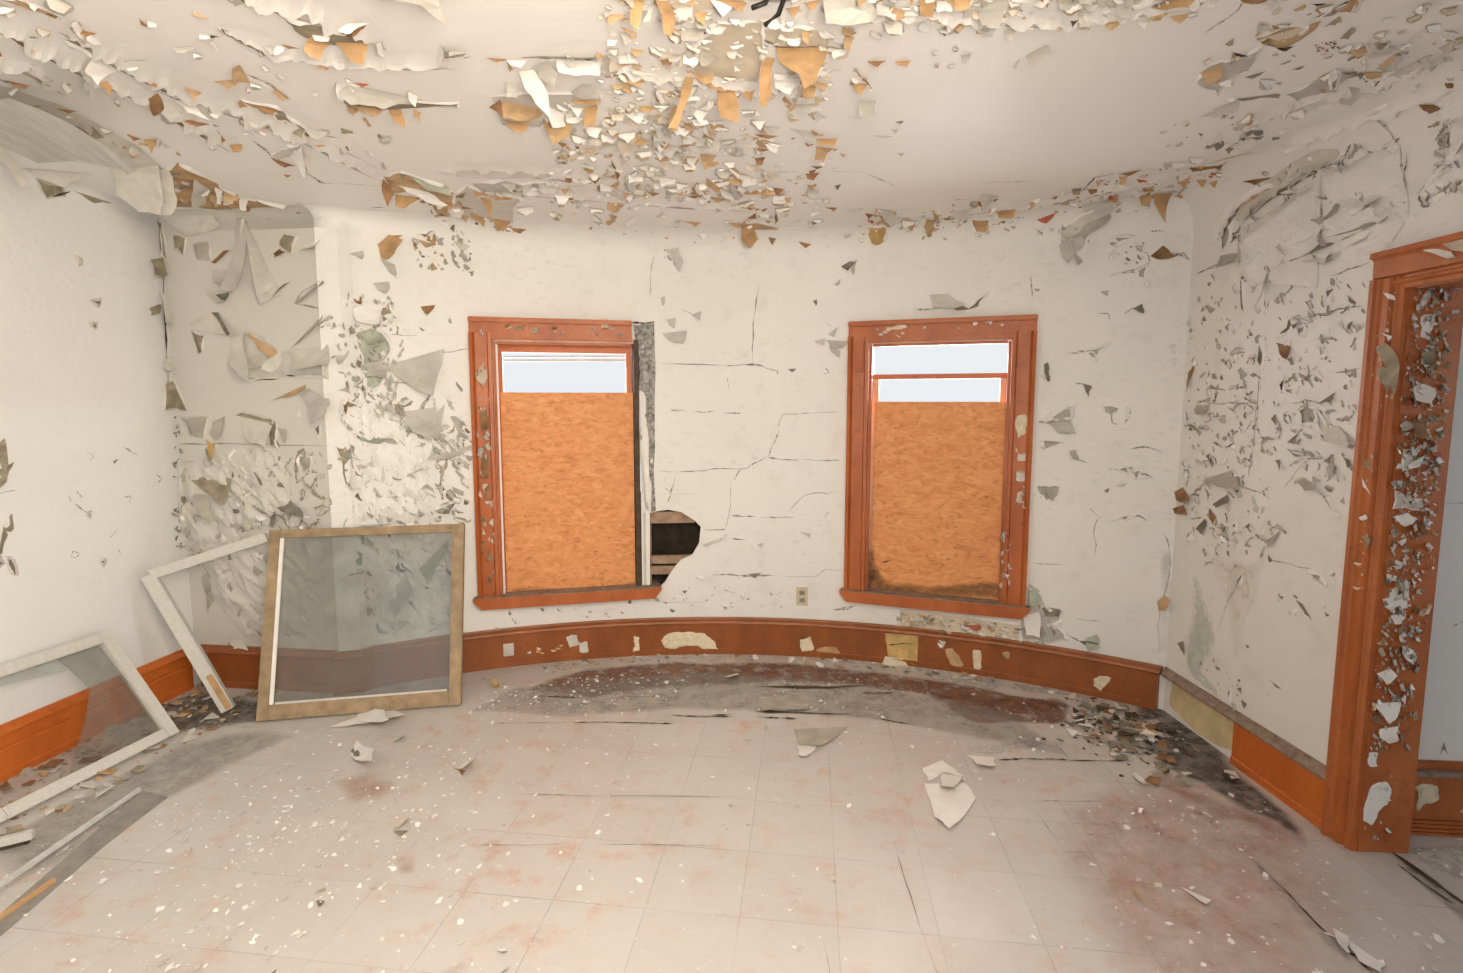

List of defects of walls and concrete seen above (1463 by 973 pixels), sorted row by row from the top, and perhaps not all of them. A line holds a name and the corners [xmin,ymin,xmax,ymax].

peeling [0,0,1463,634]
crack [661,288,829,414]
crack [661,411,841,578]
peeling [1168,237,1463,841]
spalling [882,532,1100,670]
peeling [229,615,262,651]
spalling [527,635,589,654]
spalling [661,632,718,650]
spalling [800,636,840,654]
spalling [1093,676,1111,691]
peeling [329,709,406,761]
peeling [794,726,848,756]